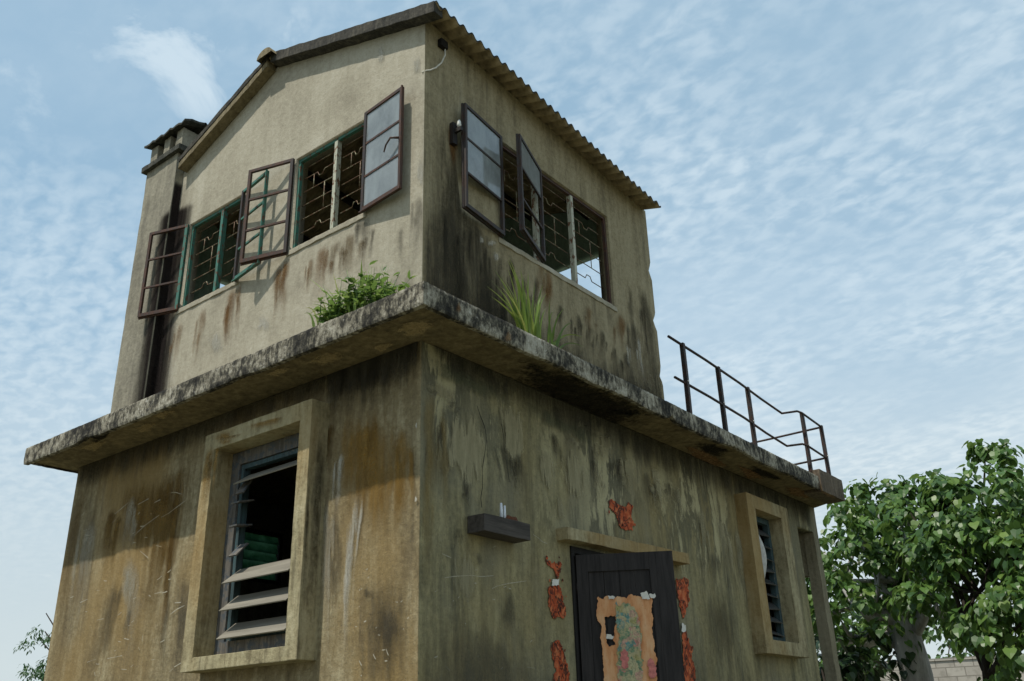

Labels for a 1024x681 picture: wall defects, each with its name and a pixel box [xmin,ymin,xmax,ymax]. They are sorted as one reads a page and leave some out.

leakage [79,342,417,484]
leakage [436,346,809,518]
leakage [74,471,183,607]